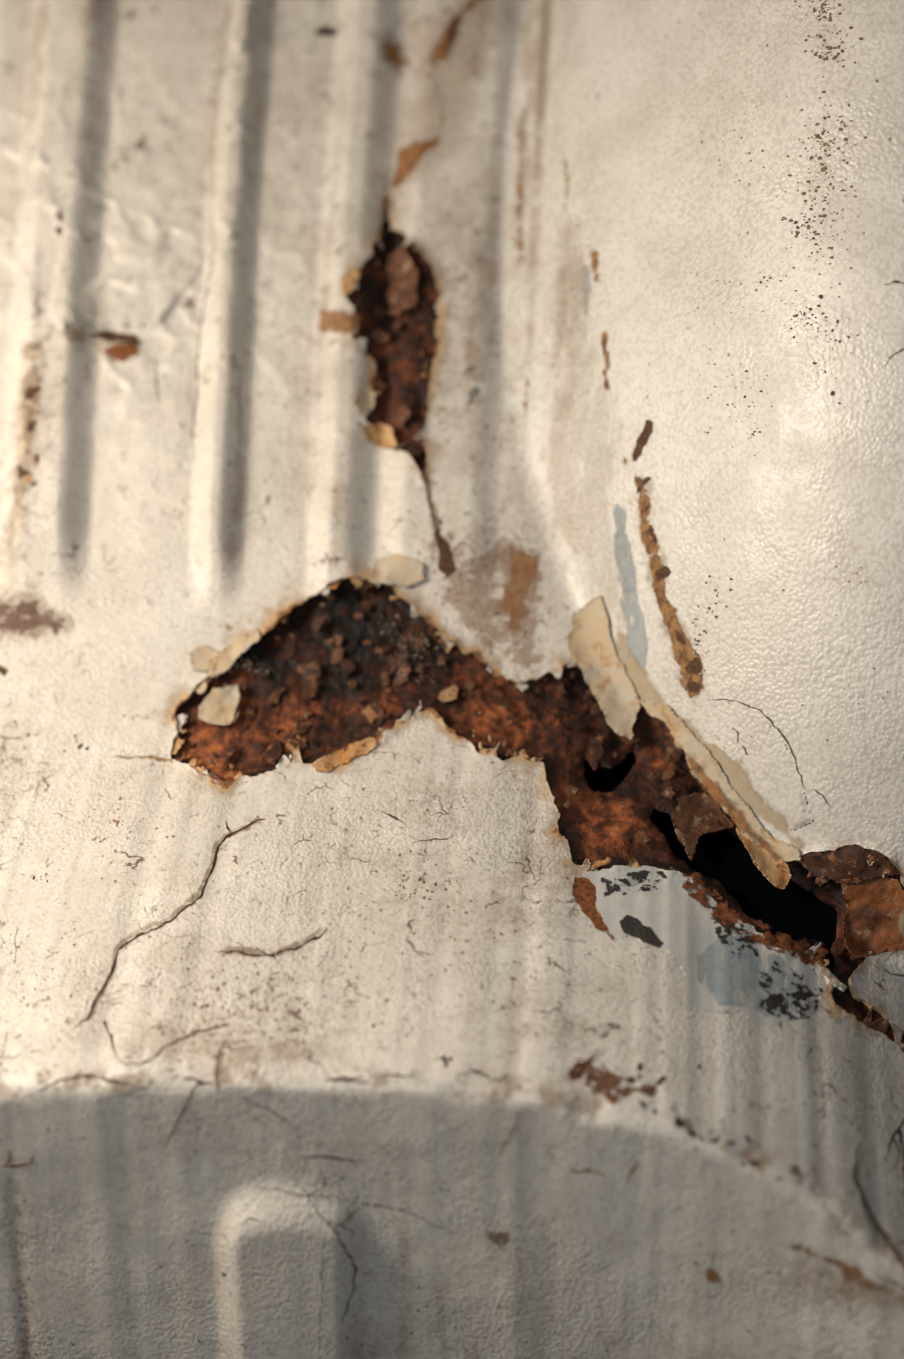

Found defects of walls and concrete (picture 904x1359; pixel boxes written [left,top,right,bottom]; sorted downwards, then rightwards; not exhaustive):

rust [319,139,478,482]
rust [590,250,599,281]
rust [601,332,610,390]
rust [0,600,64,636]
rust [415,513,547,664]
rust [613,420,733,698]
rust [162,849,536,1083]
rust [672,792,734,861]
rust [795,844,904,960]
crack [25,819,454,1358]
rust [568,1056,667,1105]
crack [834,1119,904,1289]